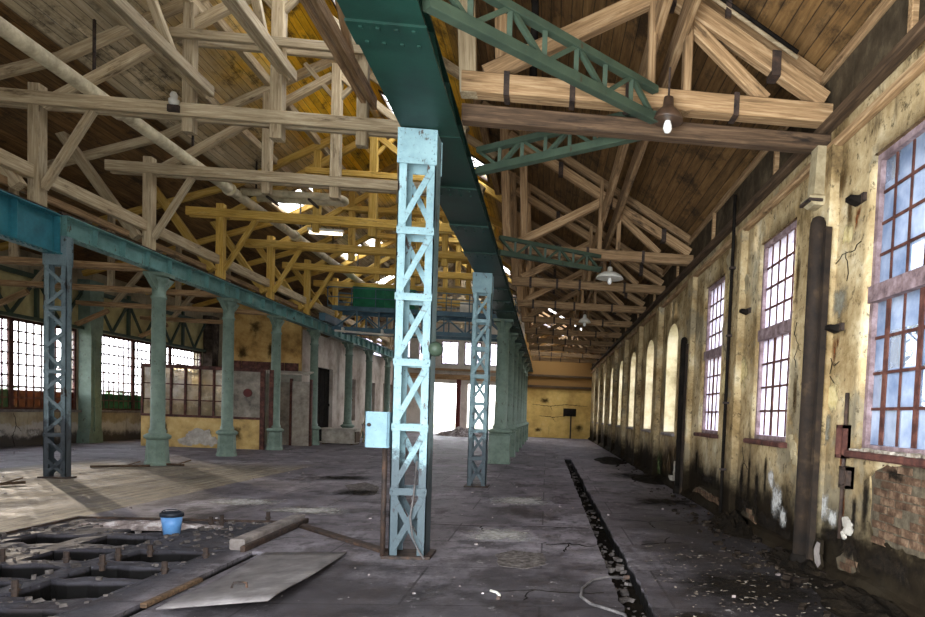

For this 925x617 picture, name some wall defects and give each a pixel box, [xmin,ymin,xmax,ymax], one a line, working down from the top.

crack [836,241,862,281]
peeling [178,428,218,447]
damp [735,458,792,541]
damp [851,478,869,529]
damp [821,497,921,589]
spalling [868,463,925,563]